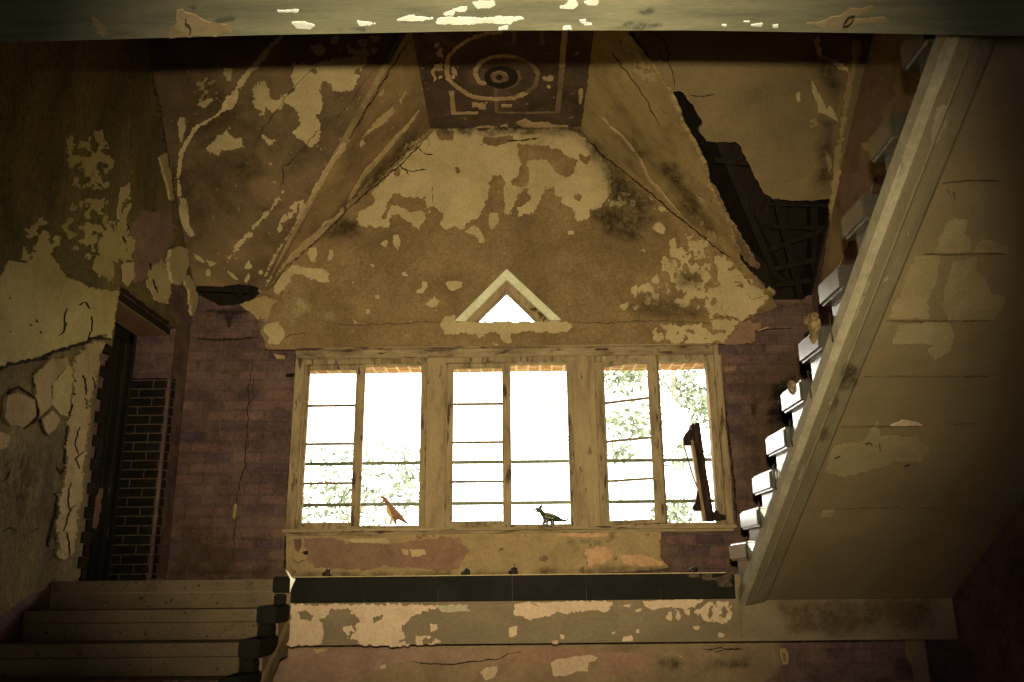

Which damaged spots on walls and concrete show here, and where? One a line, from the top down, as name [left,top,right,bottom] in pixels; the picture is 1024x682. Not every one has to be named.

flaking render [167,9,233,38]
peeling [277,9,315,29]
peeling [397,0,524,30]
peeling [560,0,599,30]
crack [280,38,412,186]
crack [612,53,659,125]
leakage [601,174,647,237]
peeling [0,20,776,560]
crack [0,302,111,555]
crack [197,332,306,568]
peeling [556,532,663,567]
peeling [509,599,732,638]